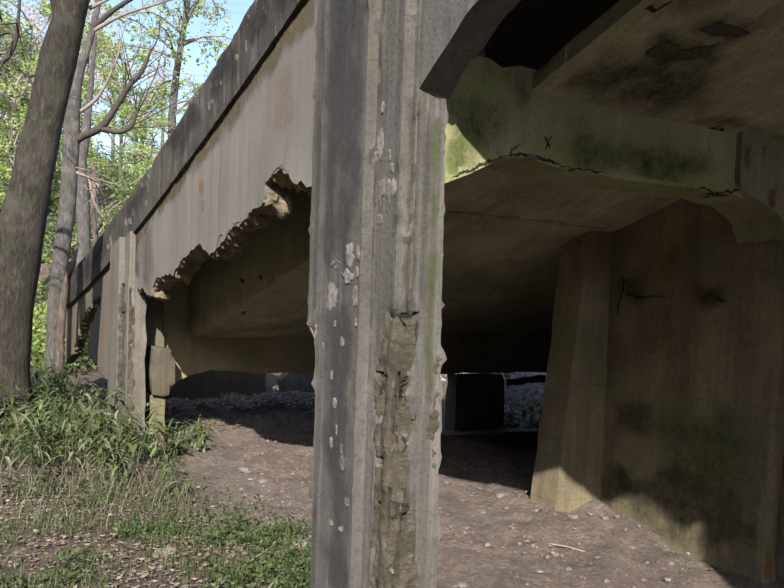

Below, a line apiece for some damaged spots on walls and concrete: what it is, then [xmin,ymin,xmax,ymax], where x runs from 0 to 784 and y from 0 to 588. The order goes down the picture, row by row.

peeling [645,21,750,63]
peeling [376,129,397,203]
crack [453,136,605,177]
crack [690,186,739,198]
spalling [72,294,104,377]
spalling [116,169,312,431]
peeling [326,283,337,327]
peeling [331,242,360,307]
spalling [369,310,420,588]